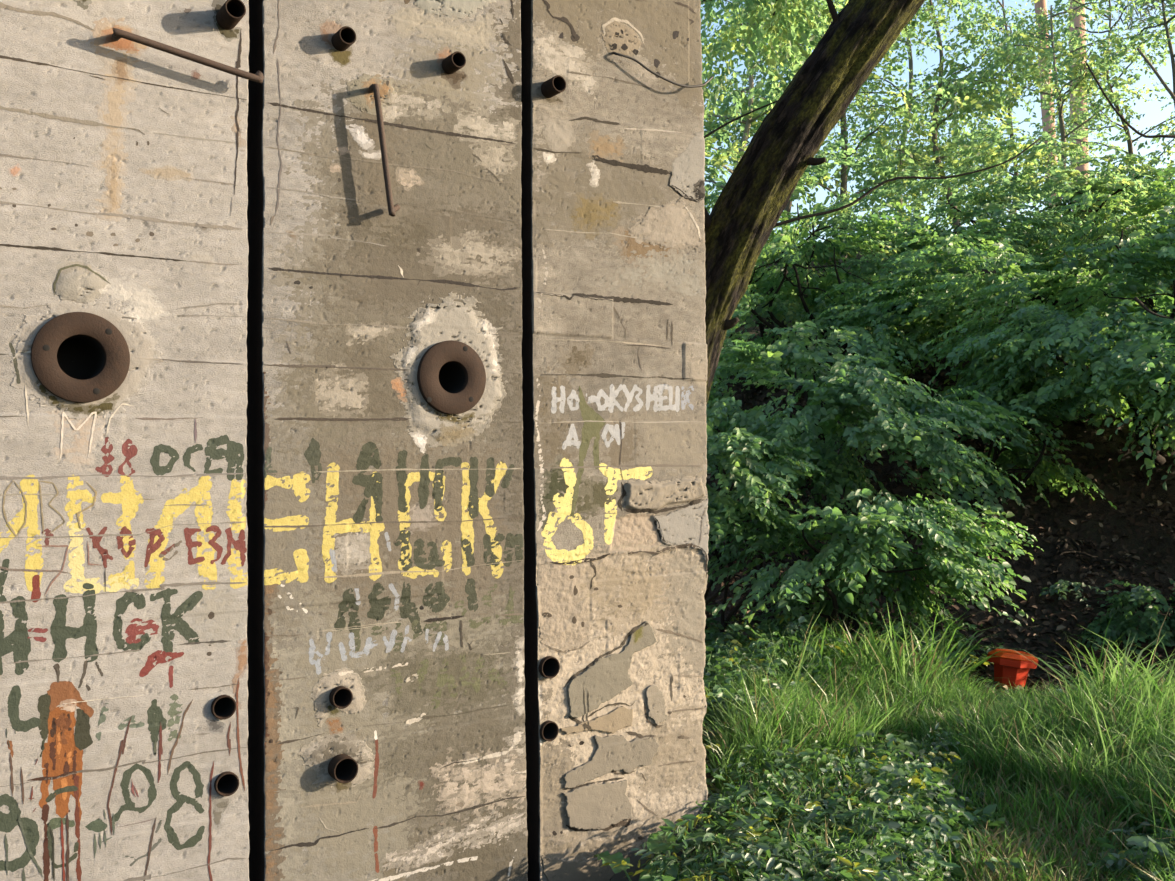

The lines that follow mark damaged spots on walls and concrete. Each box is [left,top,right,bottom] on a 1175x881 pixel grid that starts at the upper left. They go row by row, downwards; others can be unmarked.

crack [230,35,242,216]
crack [270,0,283,225]
rust [361,74,393,109]
crack [500,0,514,84]
crack [543,0,576,39]
spalling [536,512,708,881]